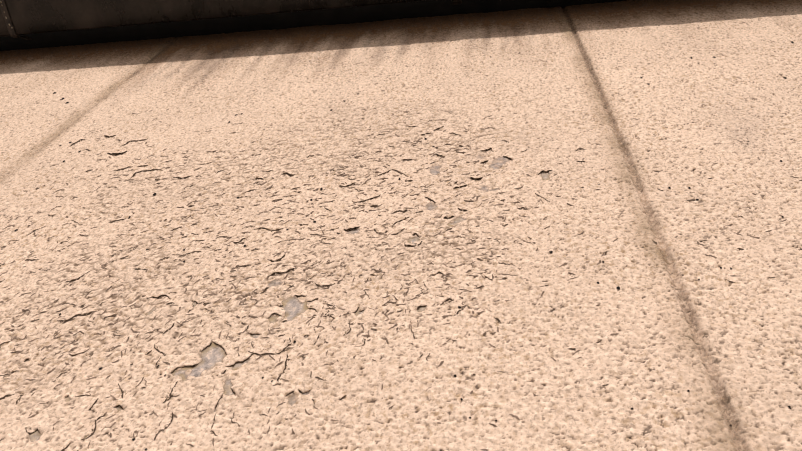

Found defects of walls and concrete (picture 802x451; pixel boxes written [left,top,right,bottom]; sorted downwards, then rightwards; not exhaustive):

crack [725,215,786,250]
crack [0,103,600,451]
crack [559,238,618,279]
peeling [262,289,326,323]
peeling [167,337,253,413]